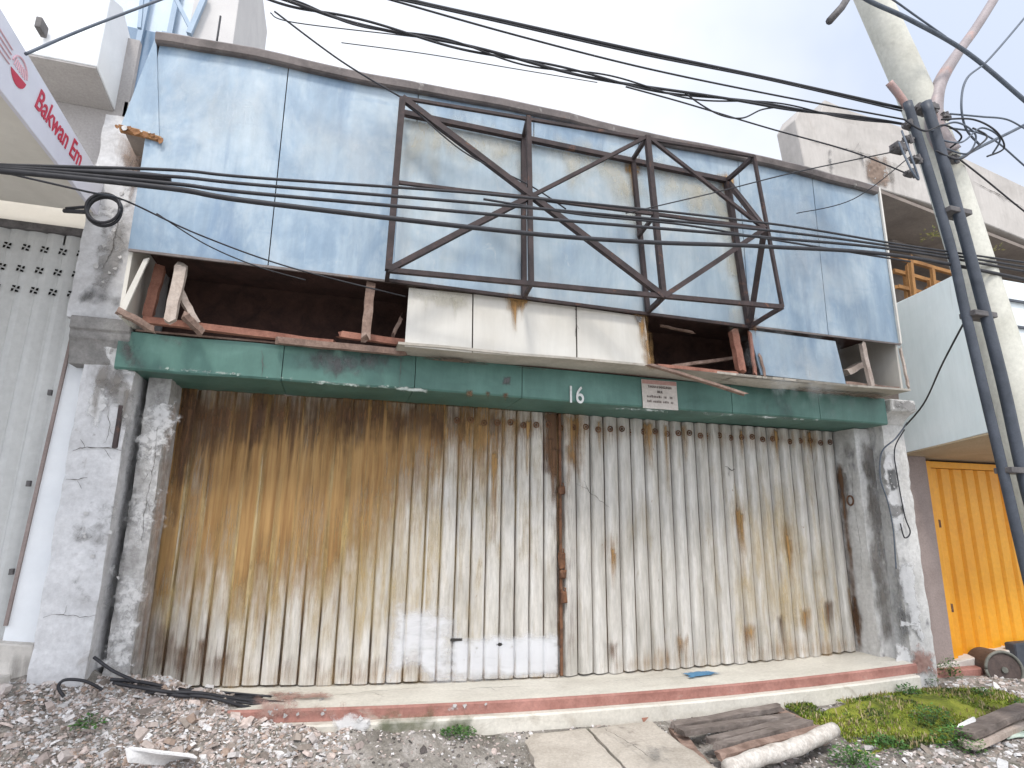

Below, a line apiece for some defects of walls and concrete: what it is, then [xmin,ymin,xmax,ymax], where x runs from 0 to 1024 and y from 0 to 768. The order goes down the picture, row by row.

rust [508,298,528,326]
crack [73,411,122,457]
spalling [87,347,180,470]
crack [141,428,158,540]
rust [139,377,530,669]
rust [736,510,744,541]
rust [837,466,861,645]
damp [864,444,909,638]